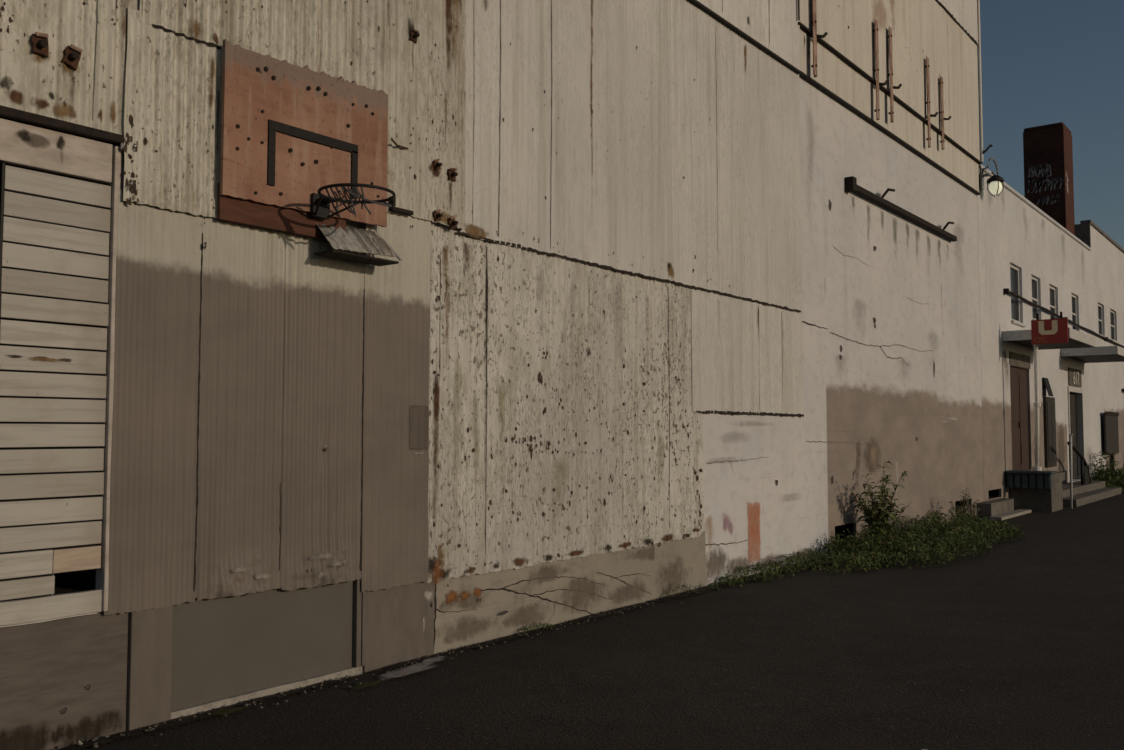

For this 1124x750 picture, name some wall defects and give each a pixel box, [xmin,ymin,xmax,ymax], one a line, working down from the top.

rust [446,0,461,61]
rust [430,163,452,223]
rust [464,224,485,262]
rust [440,247,449,337]
crack [802,321,933,362]
rust [645,528,700,545]
rust [429,546,450,584]
rust [446,588,481,607]
crack [434,572,651,645]
leakage [0,713,118,750]